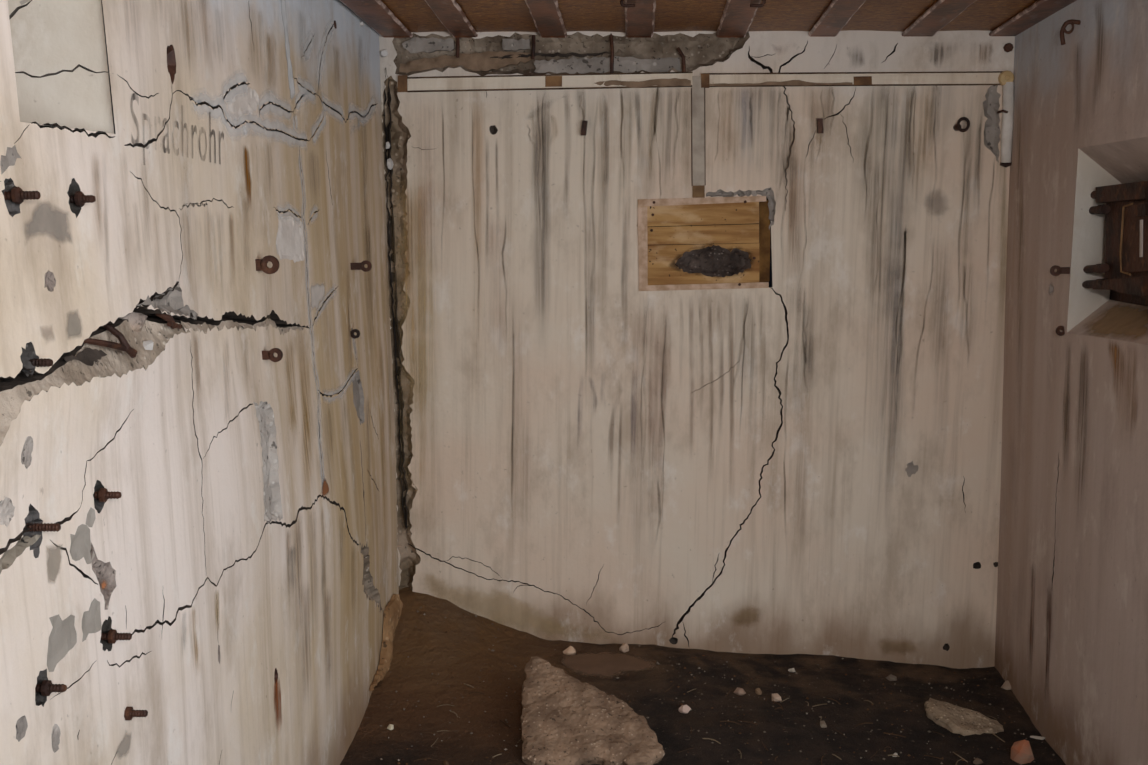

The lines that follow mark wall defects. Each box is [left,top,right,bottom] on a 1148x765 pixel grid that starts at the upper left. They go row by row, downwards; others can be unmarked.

crack [9,0,32,19]
damp [605,95,623,179]
spalling [276,215,305,263]
crack [0,24,789,700]
spalling [382,32,750,590]
spalling [254,401,283,524]